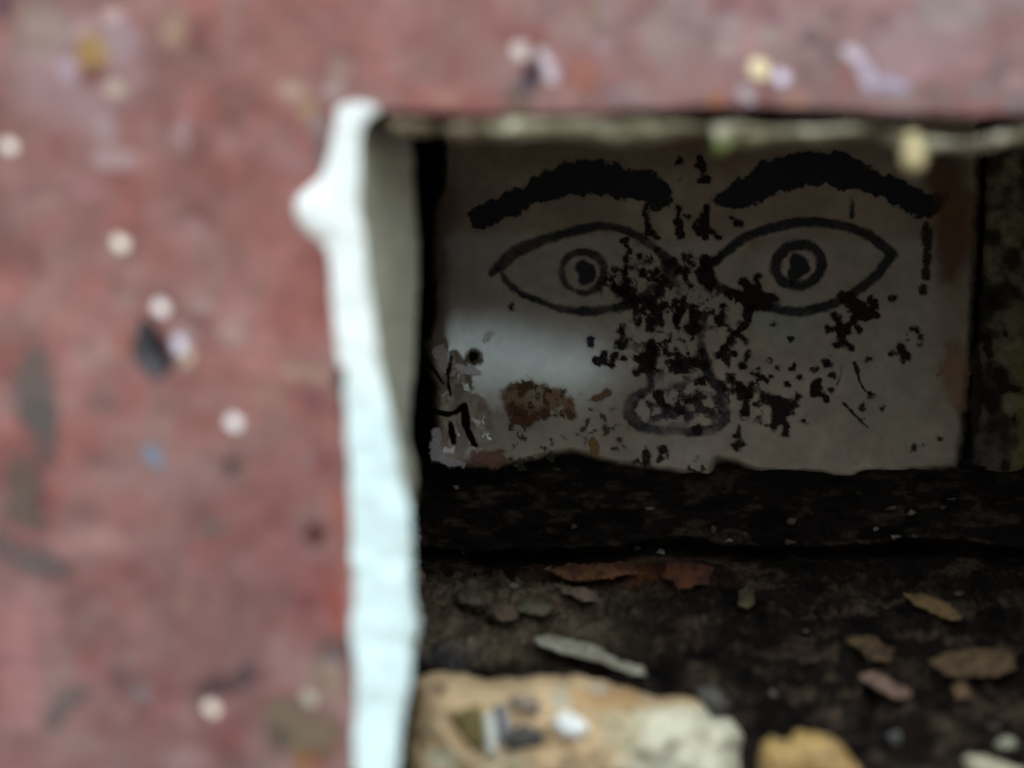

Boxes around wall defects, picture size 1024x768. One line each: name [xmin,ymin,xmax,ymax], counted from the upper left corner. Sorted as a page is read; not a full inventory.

spalling [433,345,483,375]
corrosion [502,380,576,427]
spalling [430,428,465,466]